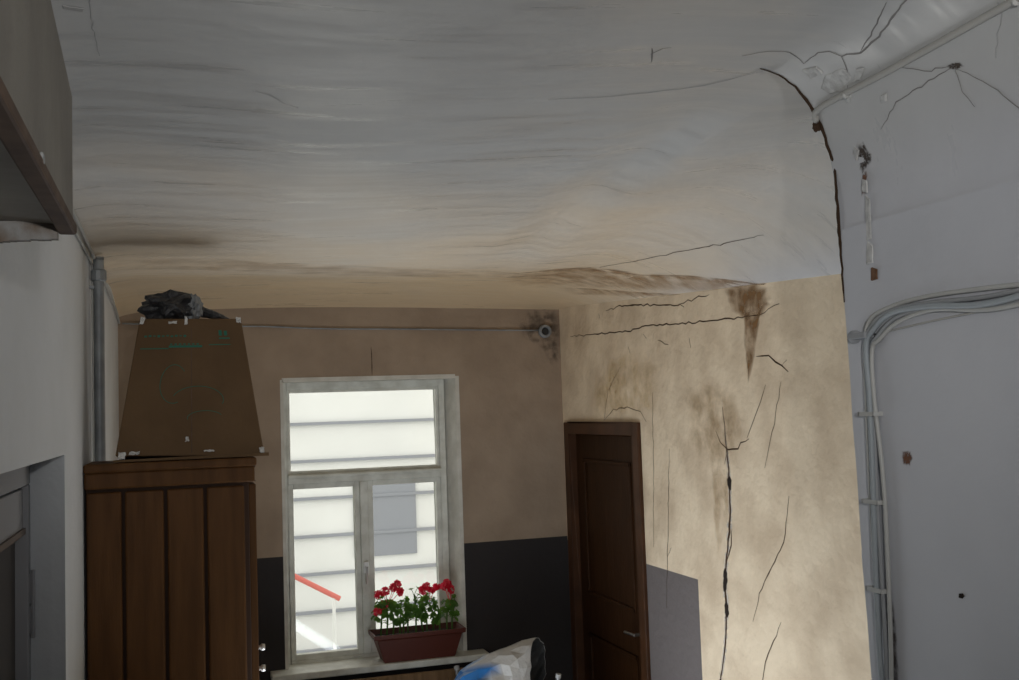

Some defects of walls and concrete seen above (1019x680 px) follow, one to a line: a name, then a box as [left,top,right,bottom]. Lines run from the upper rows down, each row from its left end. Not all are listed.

crack [548,0,907,100]
crack [881,65,1019,129]
crack [570,295,778,347]
leakage [729,286,766,338]
crack [715,355,789,680]